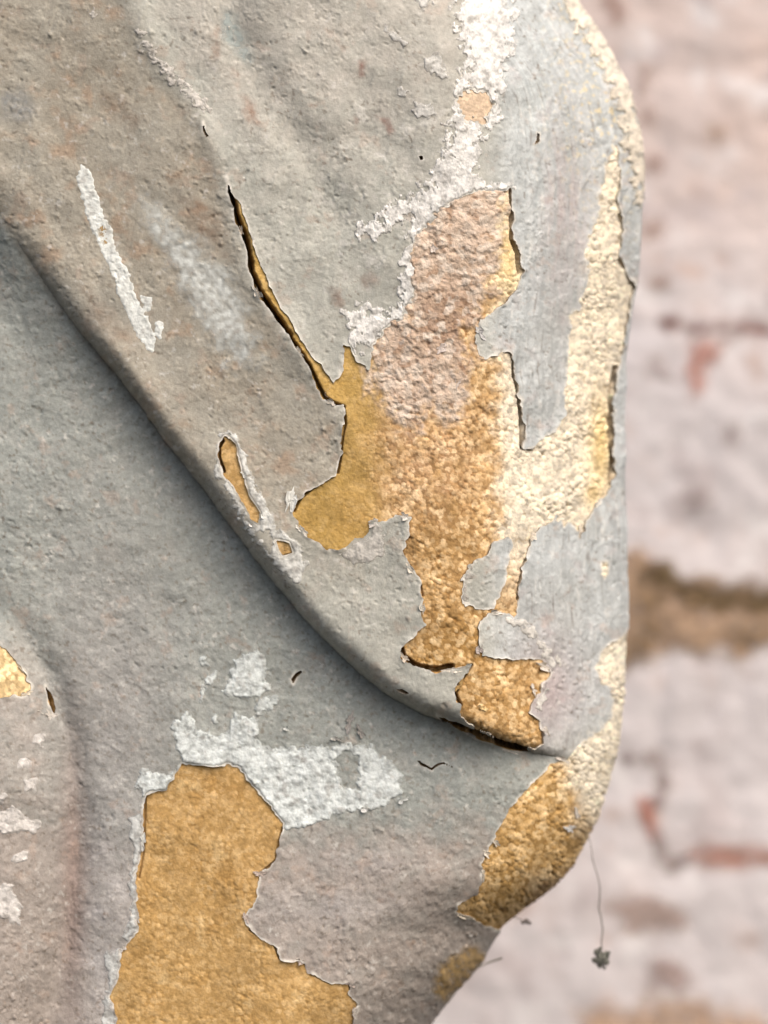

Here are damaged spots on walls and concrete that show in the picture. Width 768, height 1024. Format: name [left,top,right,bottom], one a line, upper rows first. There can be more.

crack [228,185,335,406]
peeling [214,0,645,751]
peeling [0,647,33,698]
peeling [101,651,408,1024]
peeling [457,546,768,930]